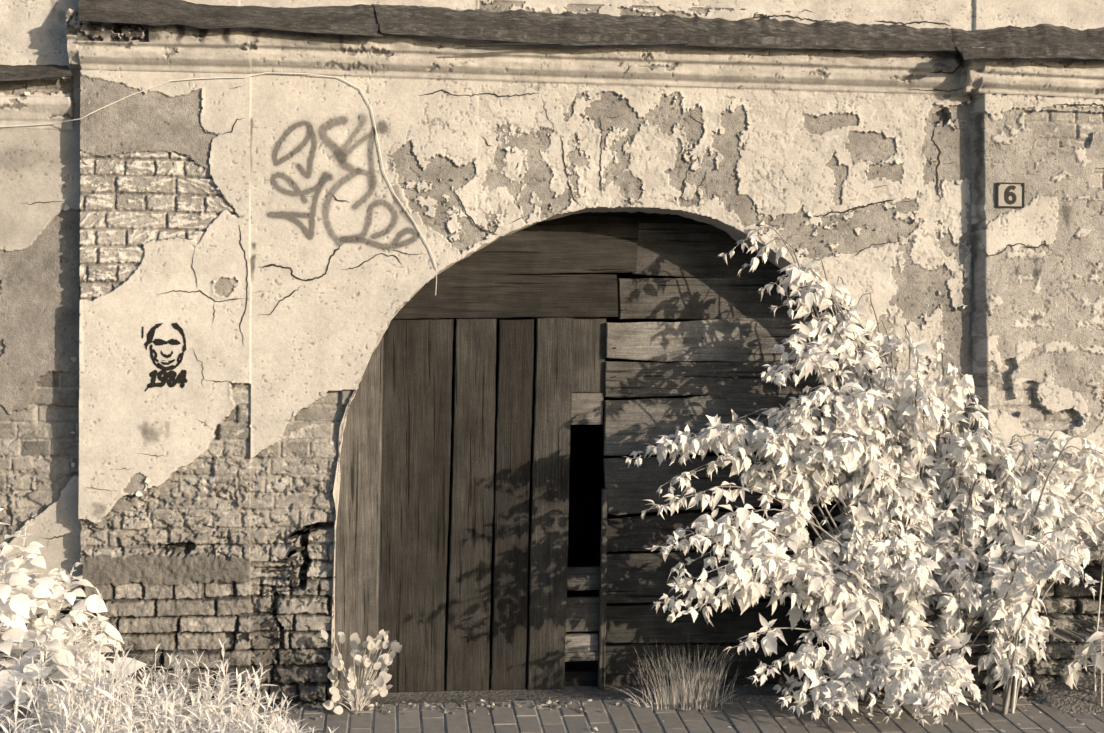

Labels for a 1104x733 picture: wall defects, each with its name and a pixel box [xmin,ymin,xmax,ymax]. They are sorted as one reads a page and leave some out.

spalling [66,10,149,49]
crack [909,66,974,94]
crack [815,120,960,217]
spalling [0,73,240,551]
crack [158,225,417,345]
peeling [388,90,1104,533]
spalling [22,380,356,710]
spalling [925,592,944,661]
spalling [957,543,1104,701]